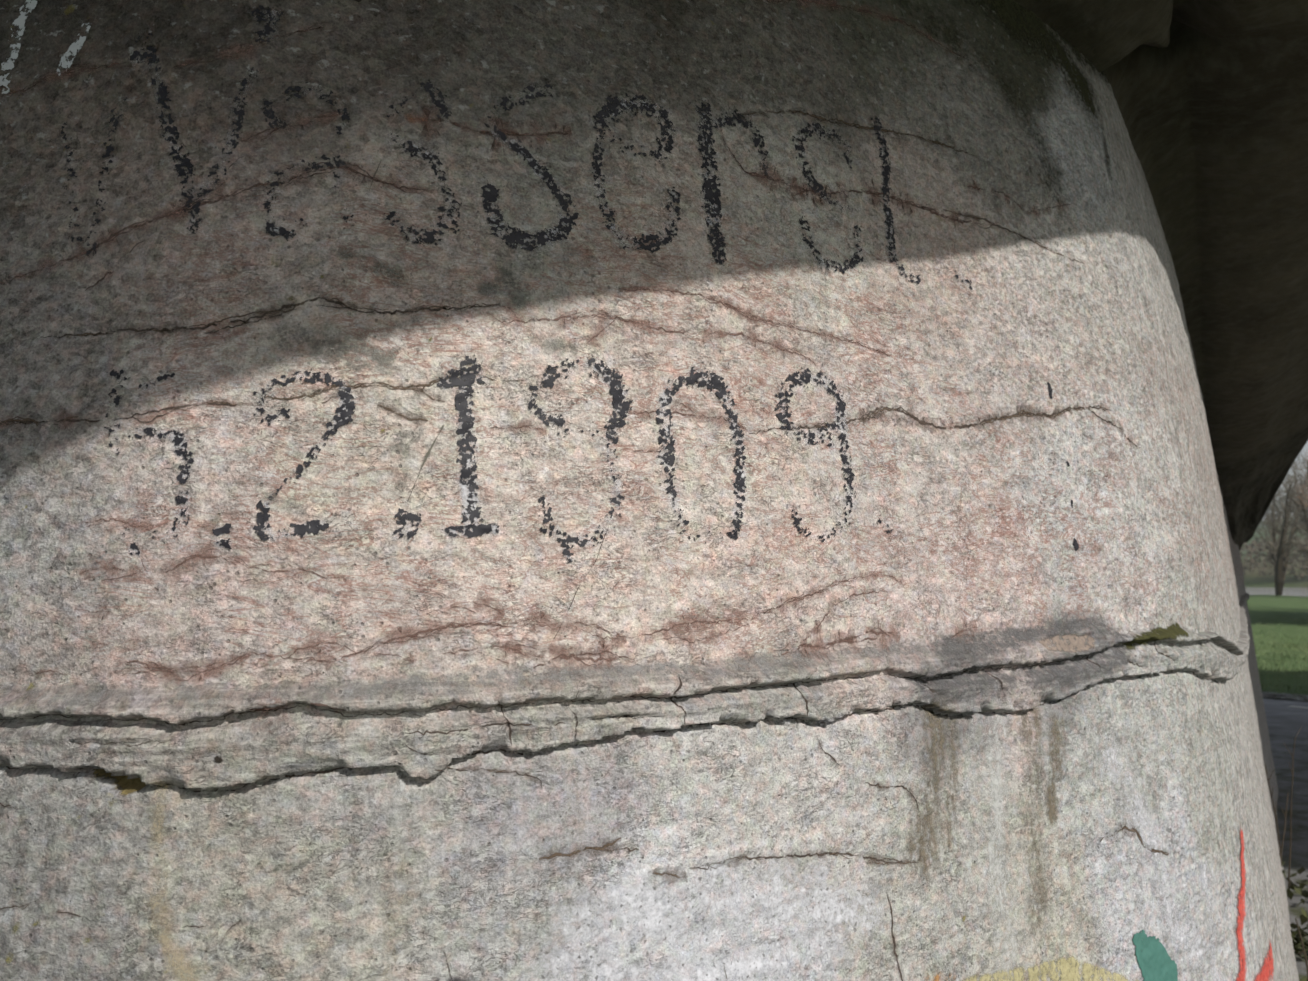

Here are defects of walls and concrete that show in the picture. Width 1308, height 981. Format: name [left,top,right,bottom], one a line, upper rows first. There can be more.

crack [741,110,968,154]
crack [945,184,1084,264]
crack [44,297,497,338]
crack [0,373,522,427]
crack [491,422,544,432]
crack [749,405,1145,452]
crack [204,573,902,675]
crack [1086,643,1171,667]
crack [405,677,686,787]
crack [793,677,854,765]
crack [865,782,921,813]